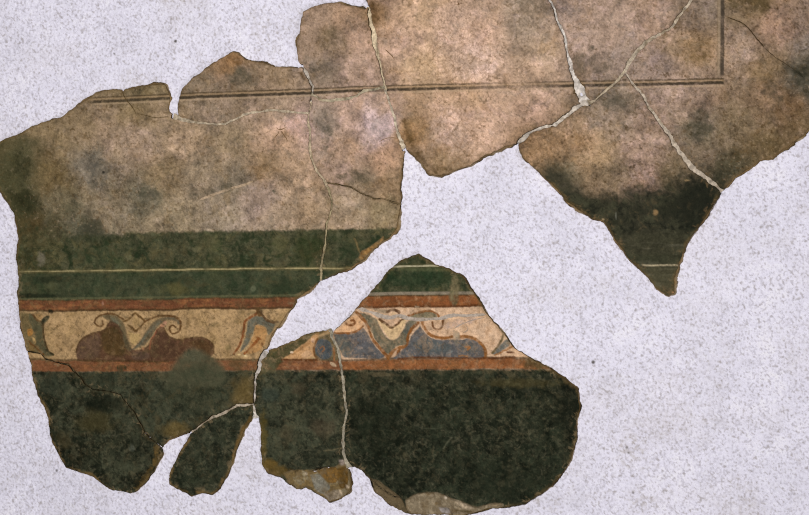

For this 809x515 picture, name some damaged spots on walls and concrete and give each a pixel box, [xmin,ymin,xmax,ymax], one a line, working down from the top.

crack [123,7,406,281]
crack [517,0,723,192]
crack [191,350,268,433]
crack [295,328,352,472]